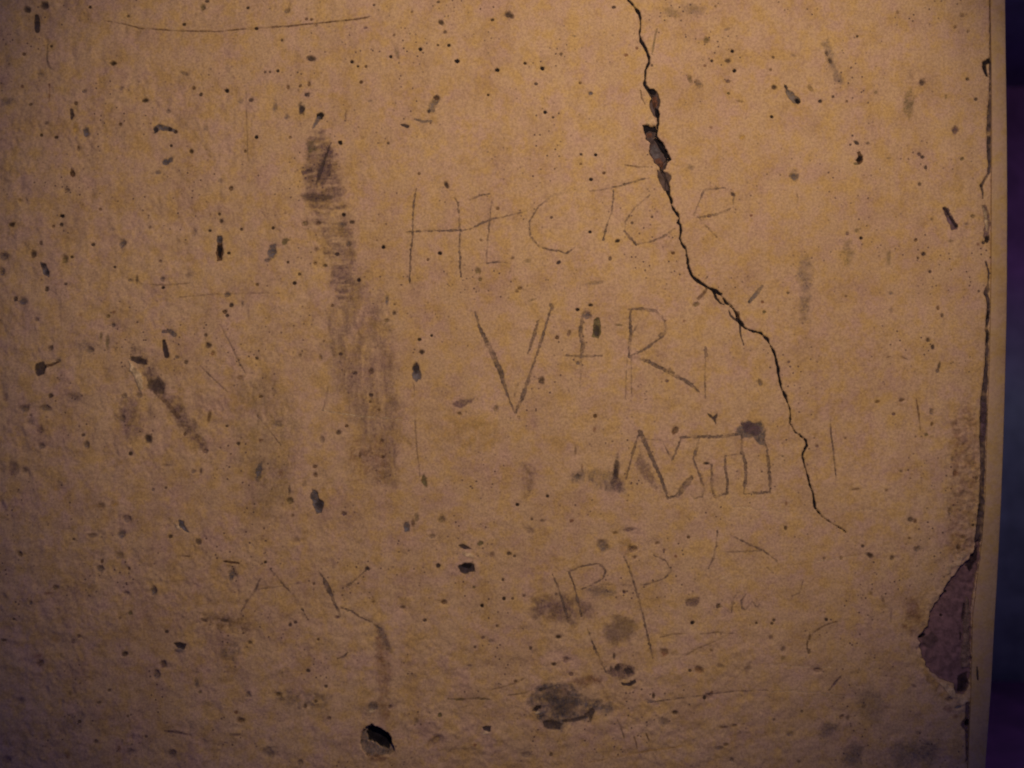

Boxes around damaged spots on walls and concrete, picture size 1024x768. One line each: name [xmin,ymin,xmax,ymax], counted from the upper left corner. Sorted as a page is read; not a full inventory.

crack [627,0,845,531]
peeling [918,540,980,762]